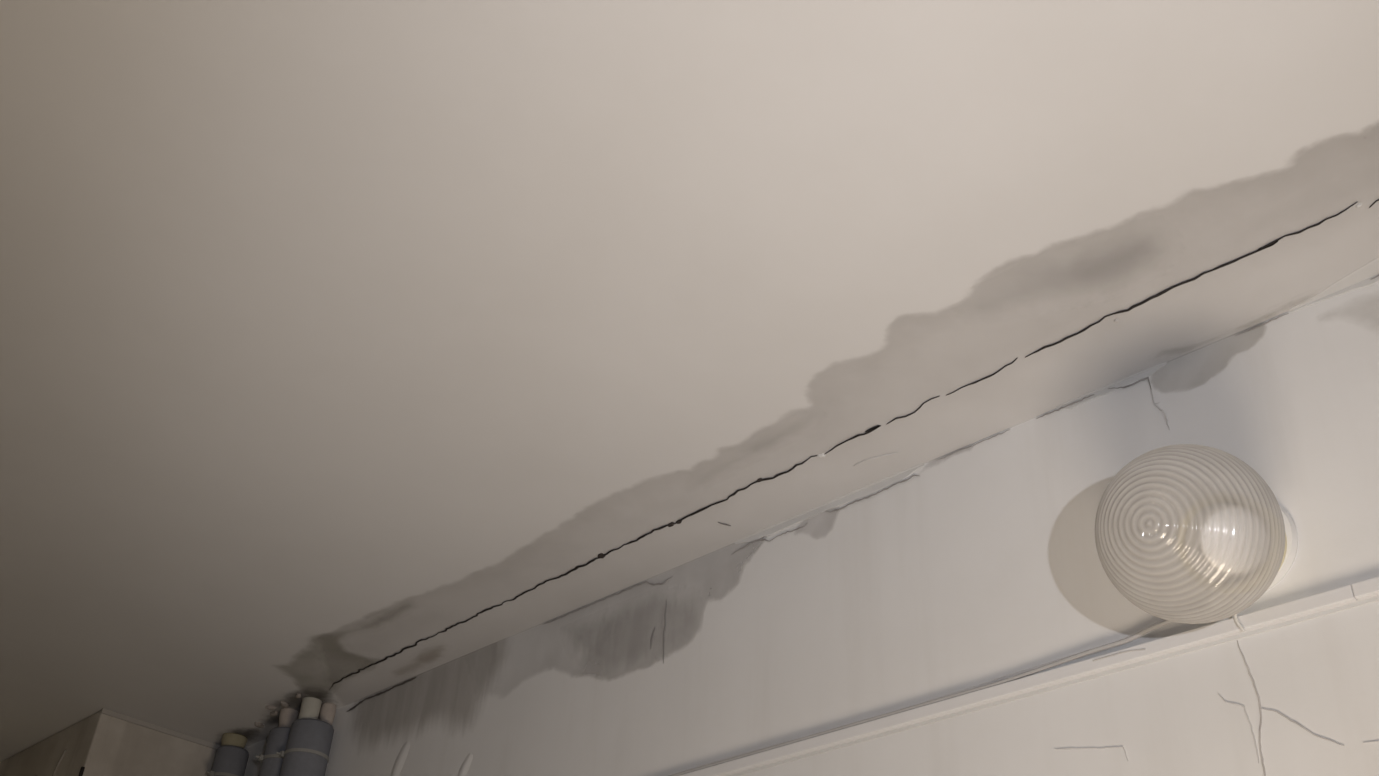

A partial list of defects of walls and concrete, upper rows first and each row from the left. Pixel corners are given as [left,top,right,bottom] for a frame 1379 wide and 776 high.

crack [329,199,1379,712]
crack [1222,640,1379,776]